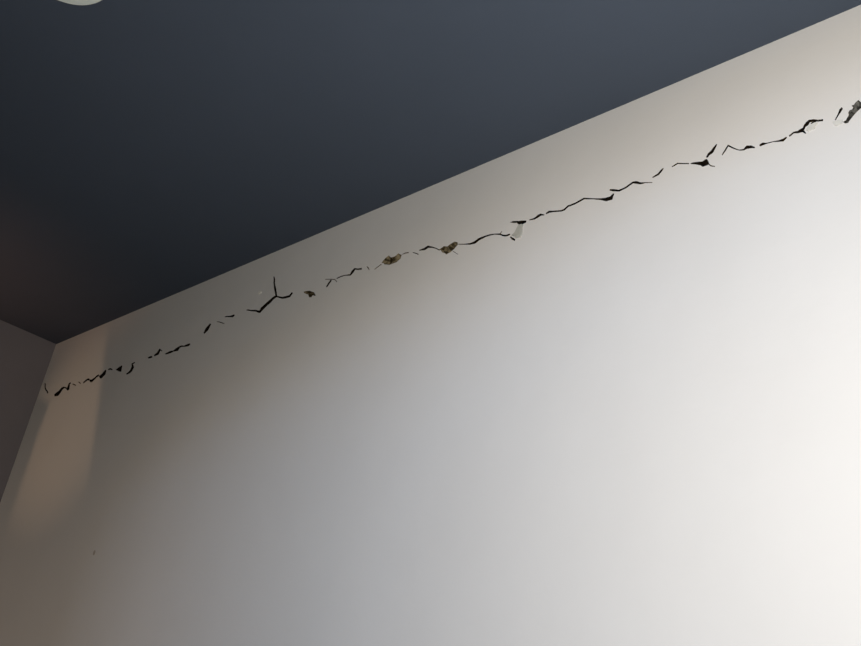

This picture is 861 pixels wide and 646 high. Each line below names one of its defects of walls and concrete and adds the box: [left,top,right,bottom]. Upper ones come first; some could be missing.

crack [529,107,843,220]
crack [325,264,382,287]
crack [402,231,510,255]
crack [44,277,293,396]